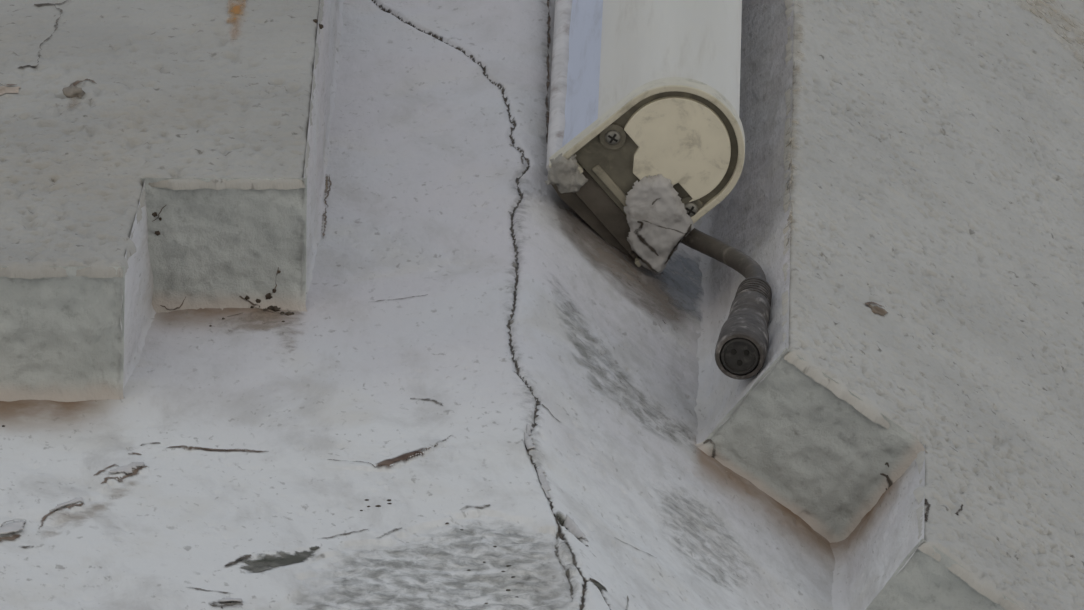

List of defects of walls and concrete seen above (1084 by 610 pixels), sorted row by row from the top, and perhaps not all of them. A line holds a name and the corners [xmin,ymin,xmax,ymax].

crack [19,0,67,68]
crack [372,0,629,610]
crack [167,444,265,452]
spalling [225,546,320,572]